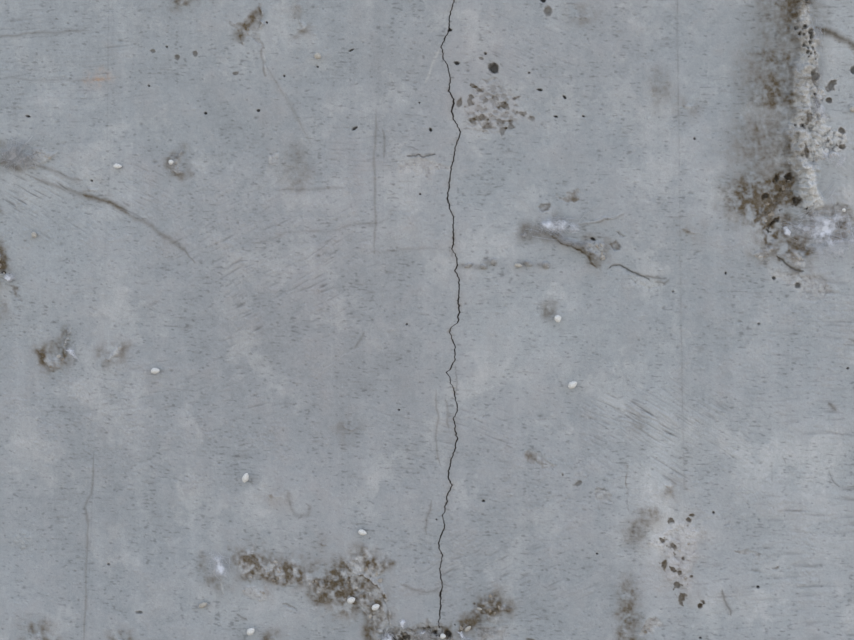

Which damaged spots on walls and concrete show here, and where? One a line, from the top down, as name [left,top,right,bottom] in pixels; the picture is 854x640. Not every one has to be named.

spalling [229,3,268,78]
spalling [794,24,850,168]
spalling [748,168,854,259]
crack [216,0,461,628]
spalling [770,268,843,305]
spalling [383,617,457,640]